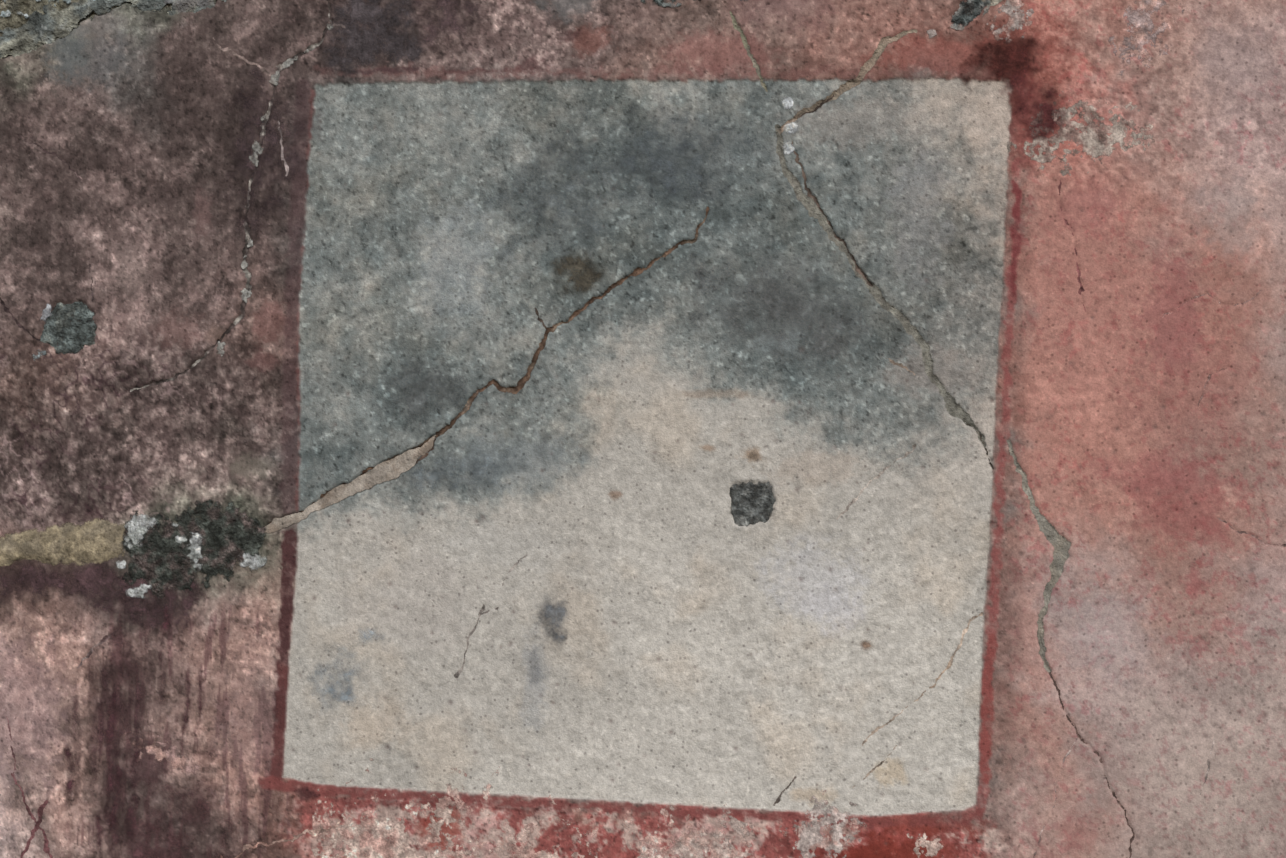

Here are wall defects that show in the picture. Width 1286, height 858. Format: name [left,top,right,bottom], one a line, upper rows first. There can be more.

flaking render [0,0,226,59]
crack [130,0,349,392]
crack [0,297,40,341]
crack [264,206,710,533]
crack [729,11,1135,858]
crack [454,555,527,678]
peeling [220,767,597,858]
peeling [637,805,753,858]
peeling [779,790,867,858]
peeling [907,833,943,858]